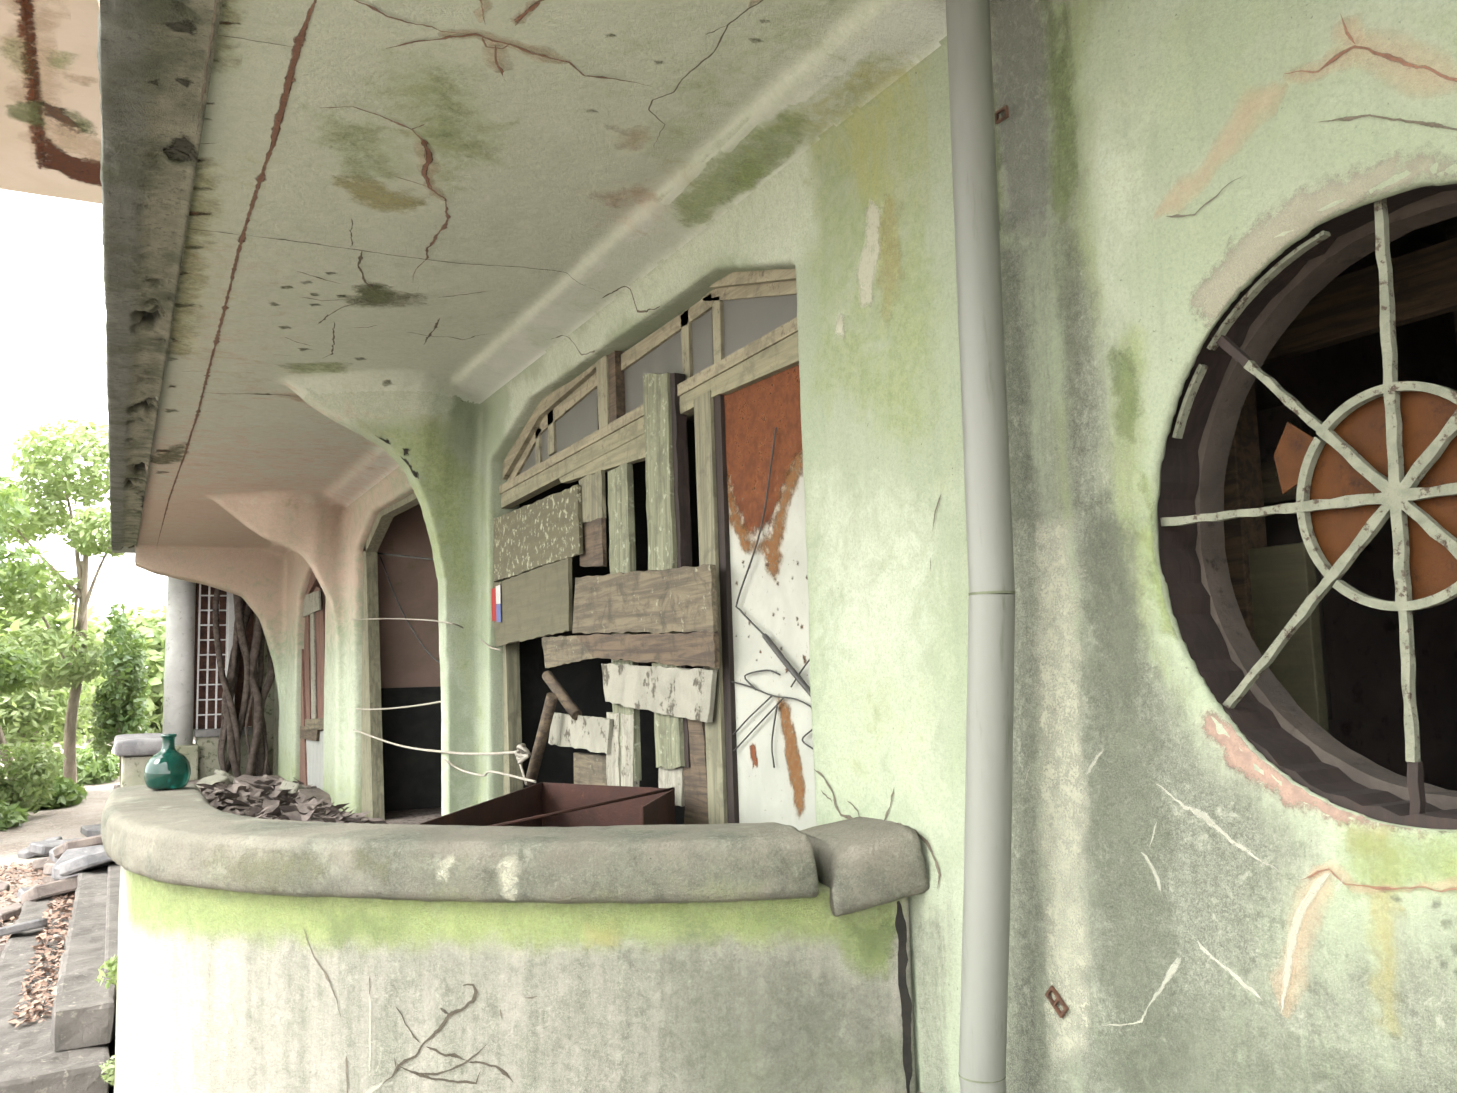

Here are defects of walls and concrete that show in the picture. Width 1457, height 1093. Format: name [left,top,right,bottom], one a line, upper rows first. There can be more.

rust [14,0,102,187]
crack [355,0,763,144]
crack [1285,14,1457,82]
crack [1320,114,1457,131]
crack [157,0,660,544]
flaking render [1191,152,1457,327]
water stain [150,444,187,474]
water stain [499,857,521,899]
crack [814,769,941,889]
crack [1156,784,1457,892]
crack [303,927,537,1093]
crack [895,901,913,1093]